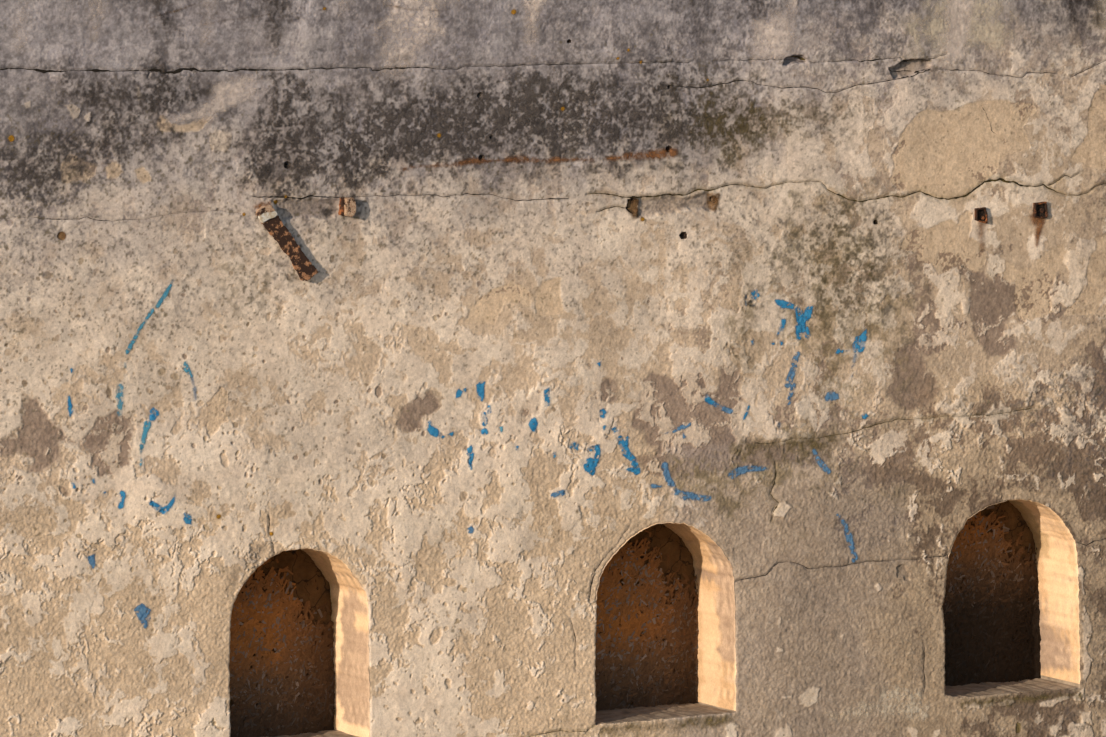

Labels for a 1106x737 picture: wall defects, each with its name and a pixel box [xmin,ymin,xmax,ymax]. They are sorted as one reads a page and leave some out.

damp [755,0,797,57]
damp [908,0,1004,58]
damp [239,0,767,198]
crack [0,54,1106,93]
damp [0,68,252,193]
rust [458,156,529,165]
rust [607,149,677,160]
crack [7,173,1106,221]
rust [1031,216,1044,245]
flaking render [1001,487,1088,540]
flaking render [1039,566,1106,737]